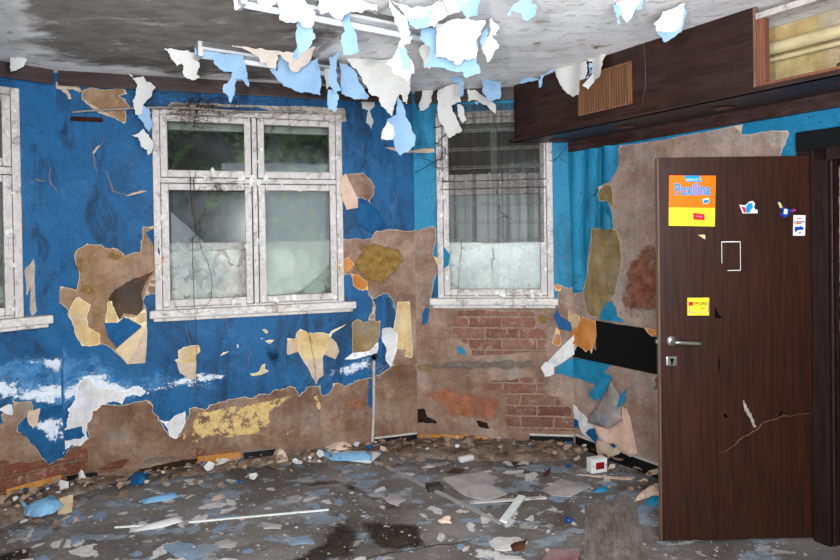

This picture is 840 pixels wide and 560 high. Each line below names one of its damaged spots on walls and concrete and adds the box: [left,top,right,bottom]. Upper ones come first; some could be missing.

peeling [506,0,537,21]
peeling [613,0,644,24]
peeling [654,3,687,42]
peeling [164,0,501,155]
peeling [520,46,606,97]
flaking render [0,124,789,497]
peeling [385,494,406,506]
peeling [442,471,507,500]